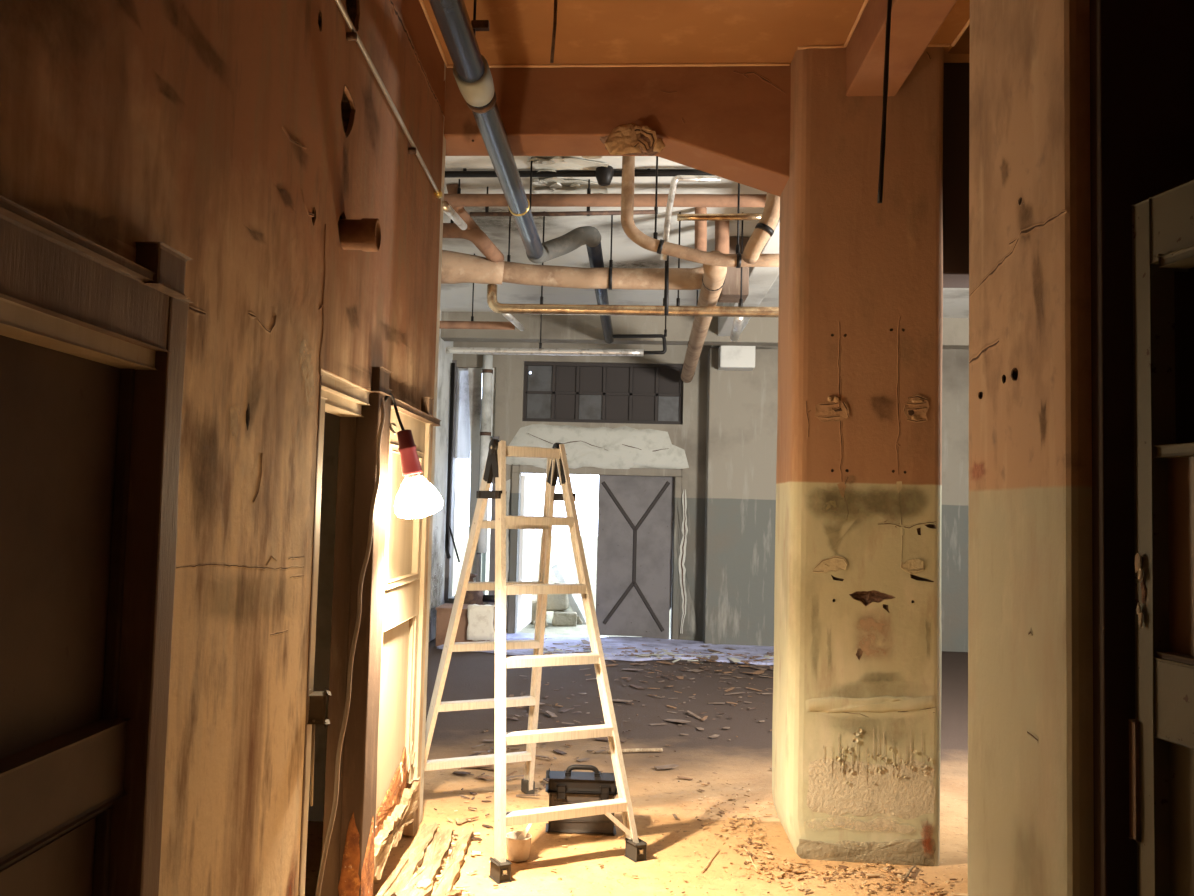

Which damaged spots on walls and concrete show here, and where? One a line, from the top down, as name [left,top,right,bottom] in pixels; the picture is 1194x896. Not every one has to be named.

crack [969,209,1067,297]
spalling [849,590,894,612]
rust [338,747,408,896]